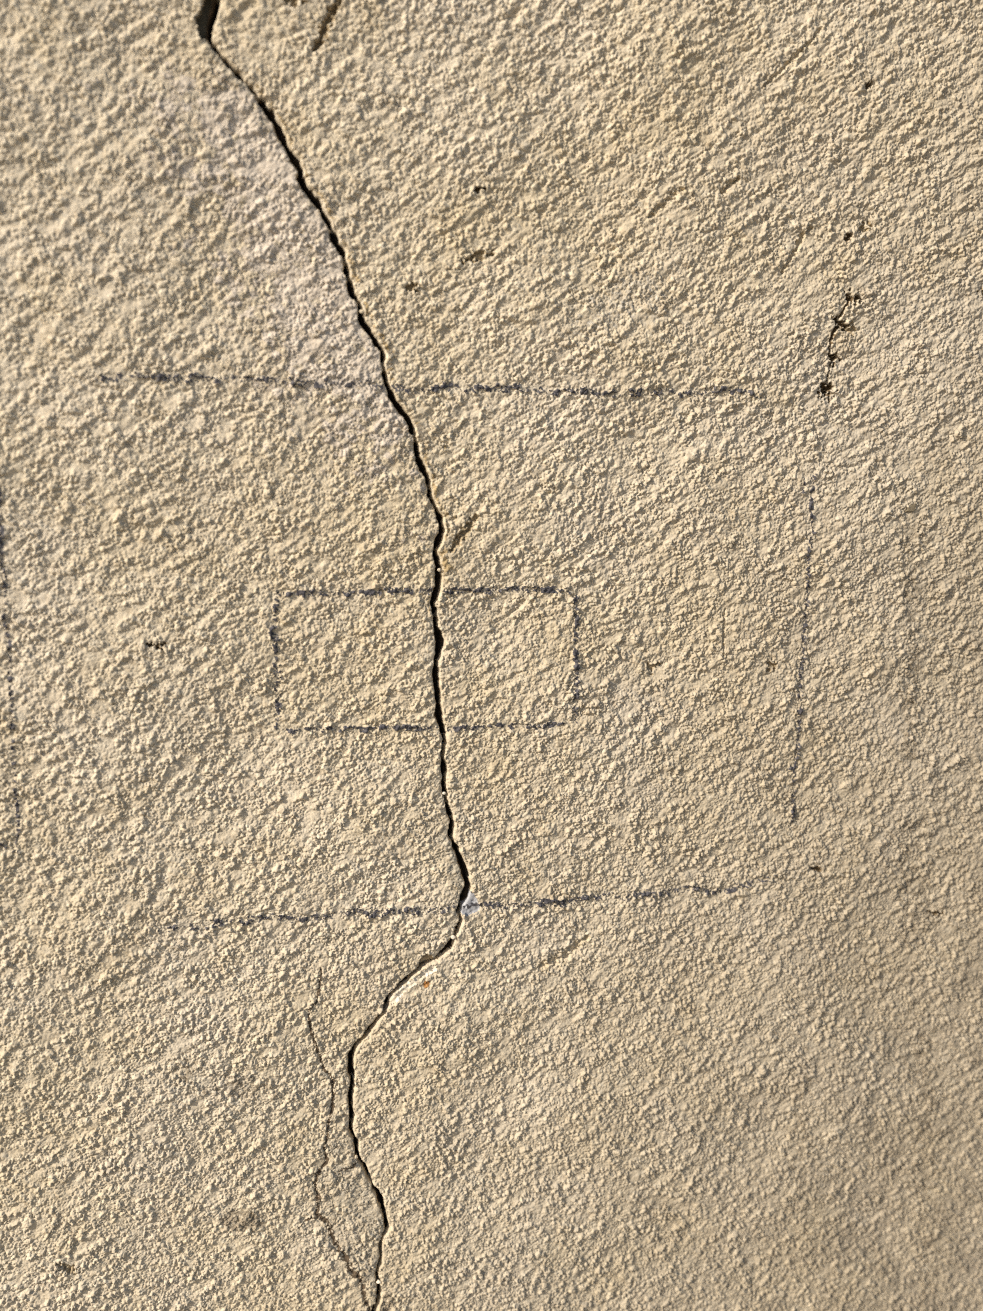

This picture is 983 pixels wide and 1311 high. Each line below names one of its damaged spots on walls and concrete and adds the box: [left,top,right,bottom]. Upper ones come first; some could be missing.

crack [206,0,470,1311]